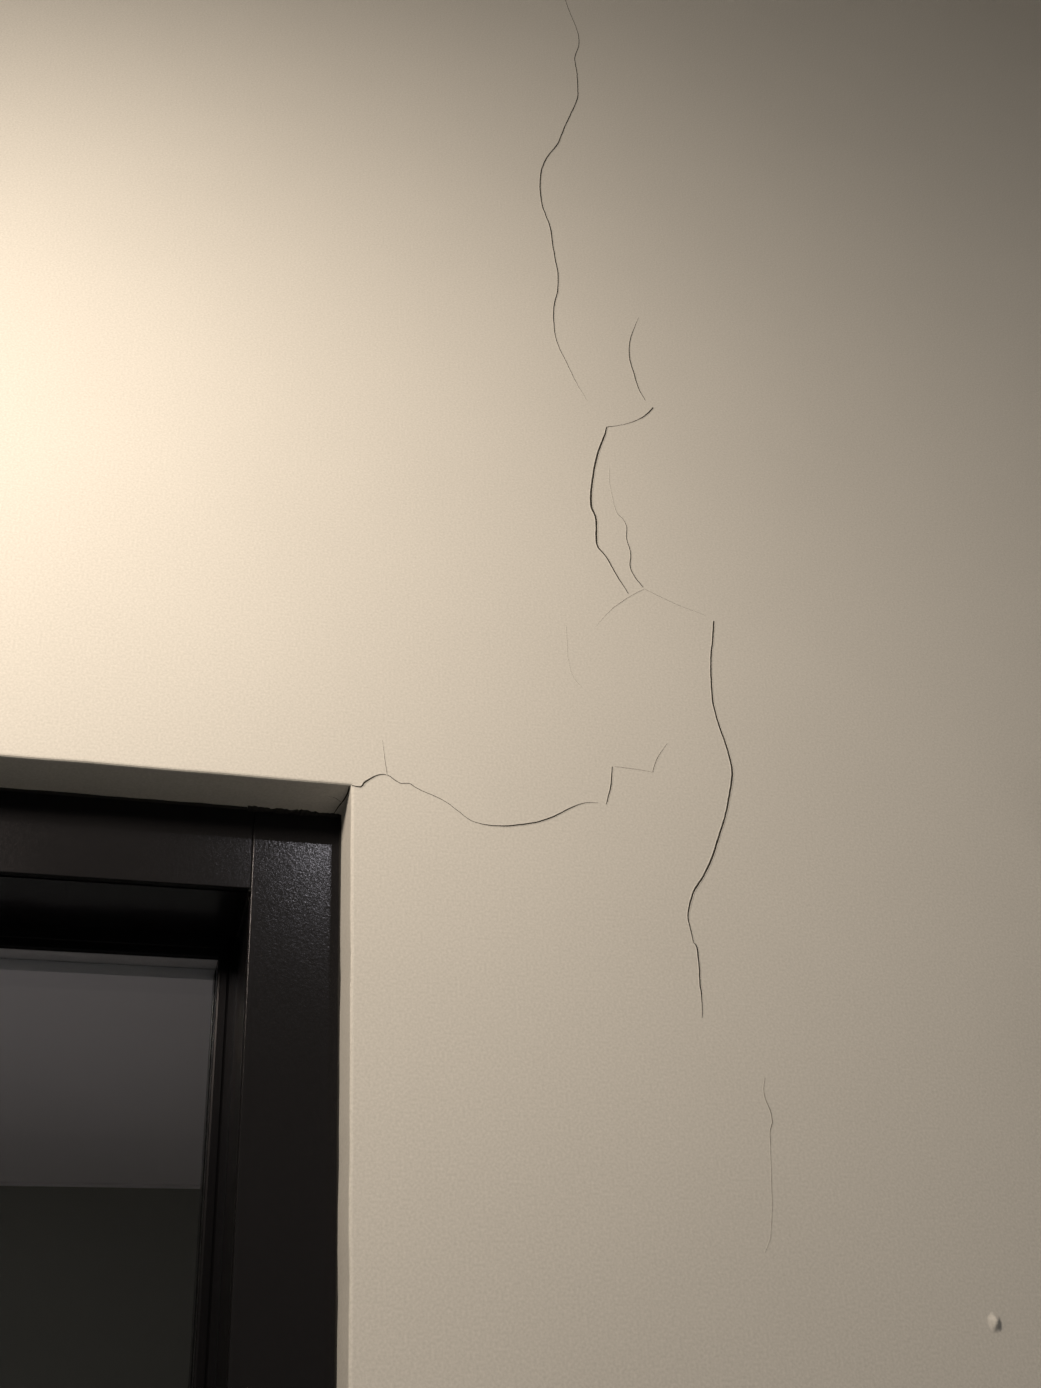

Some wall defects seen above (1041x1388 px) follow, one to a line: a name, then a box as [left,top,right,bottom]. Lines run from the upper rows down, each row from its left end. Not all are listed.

crack [324,740,668,828]
crack [539,0,734,1018]